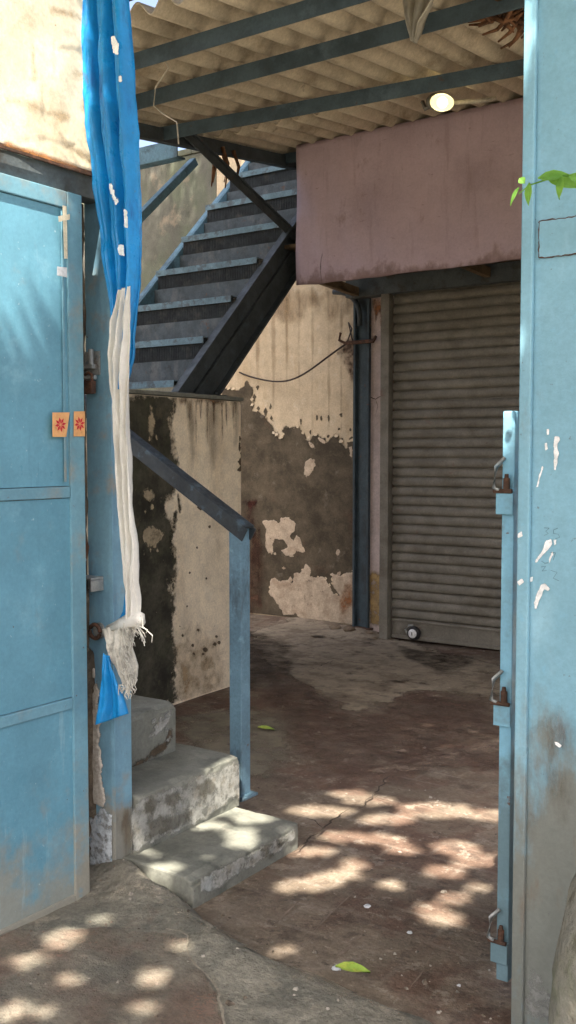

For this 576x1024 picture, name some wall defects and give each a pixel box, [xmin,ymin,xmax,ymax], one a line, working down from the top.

water stain [129,395,179,466]
peeling [536,429,560,487]
spalling [222,381,353,624]
water stain [131,455,181,703]
peeling [517,577,550,609]
peeling [535,539,556,563]
crack [292,775,391,853]